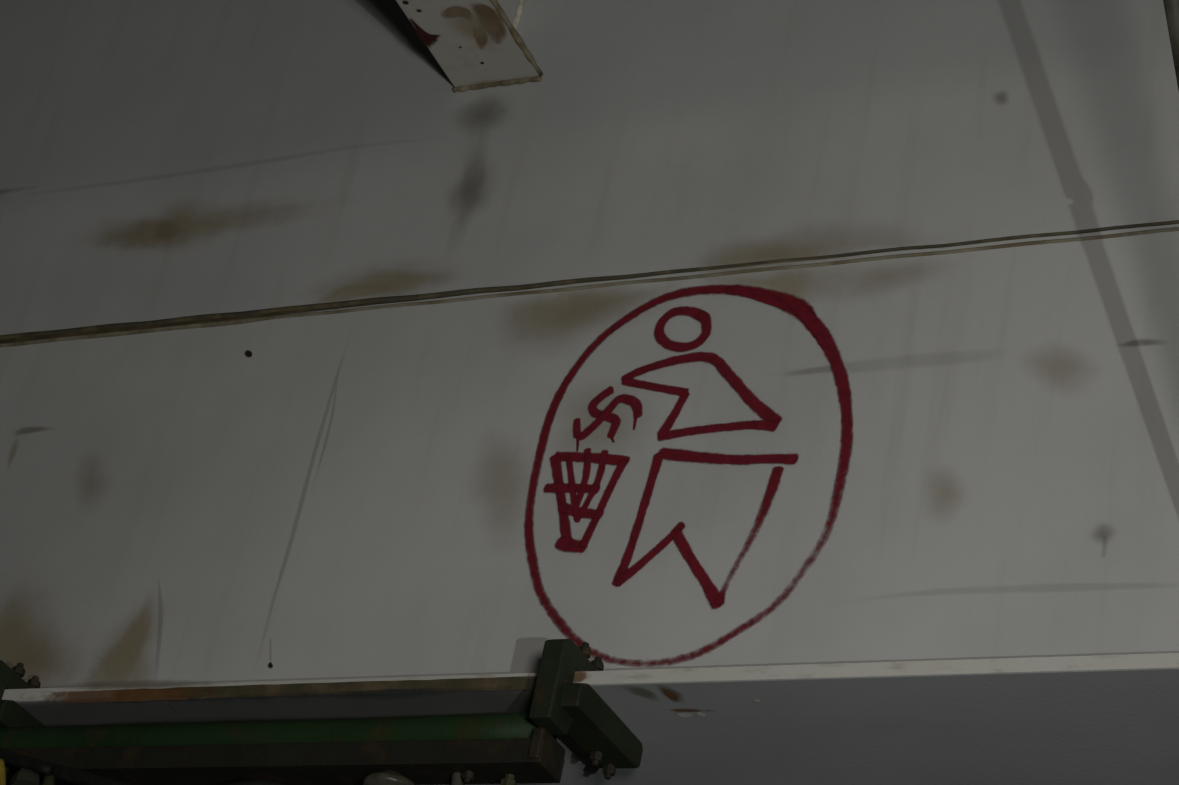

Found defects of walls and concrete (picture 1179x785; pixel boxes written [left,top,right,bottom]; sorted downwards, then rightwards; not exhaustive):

corrosion [445,5,506,47]